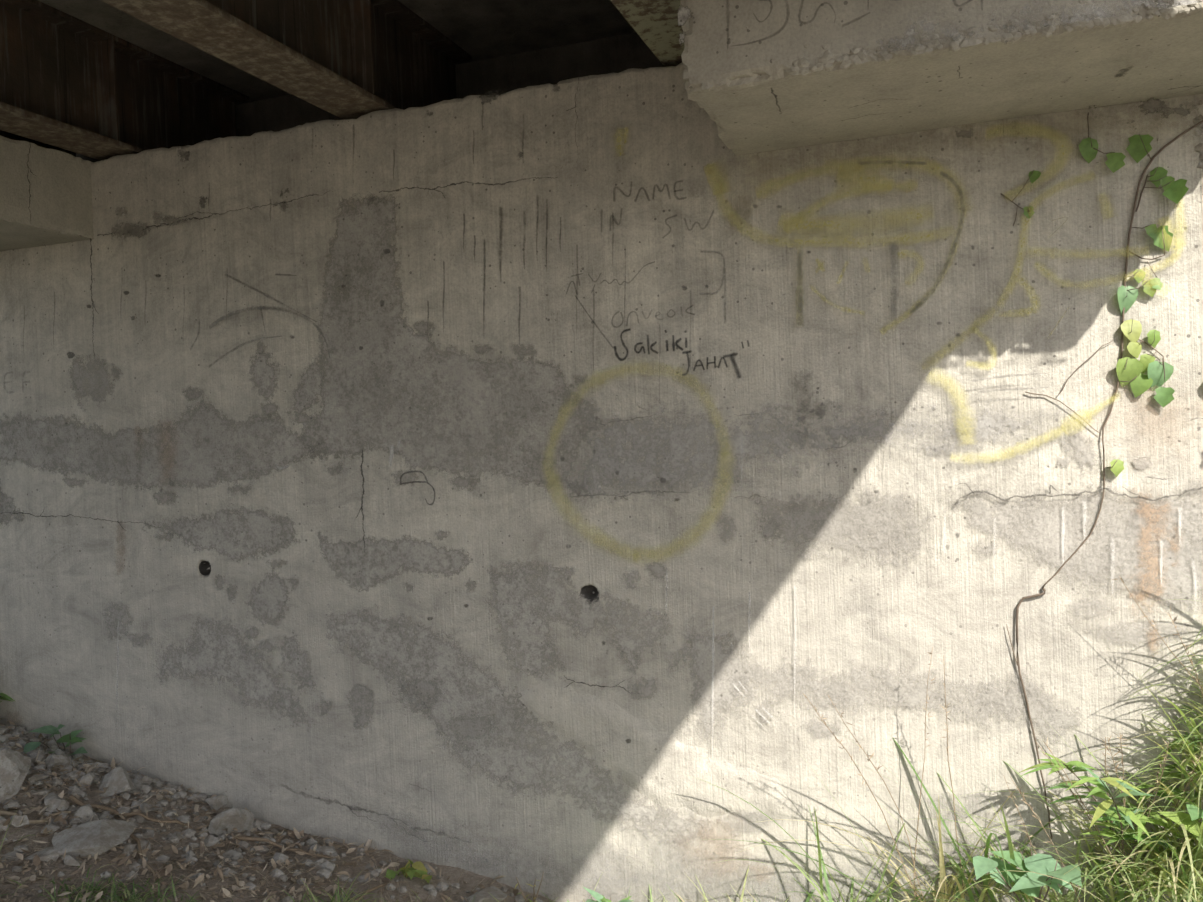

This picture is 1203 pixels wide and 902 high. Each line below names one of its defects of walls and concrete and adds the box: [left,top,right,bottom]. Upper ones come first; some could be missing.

damp [565,406,1043,501]
crack [955,476,1203,505]